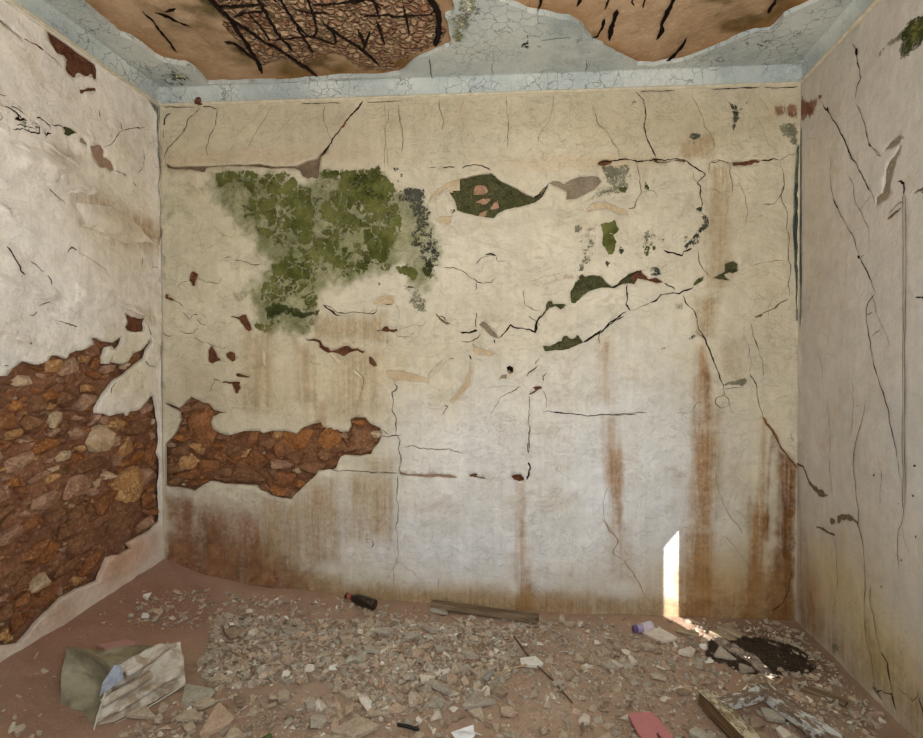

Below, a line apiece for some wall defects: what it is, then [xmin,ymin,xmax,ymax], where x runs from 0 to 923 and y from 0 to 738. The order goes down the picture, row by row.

spalling [85,0,454,85]
crack [593,0,687,62]
spalling [514,0,808,62]
crack [0,94,62,136]
mould [393,168,441,272]
flaking render [427,174,601,224]
flaking render [125,315,144,332]
flaking render [230,315,252,331]
mould [407,286,426,312]
crack [324,295,541,359]
crack [537,43,923,712]
crack [490,360,645,480]